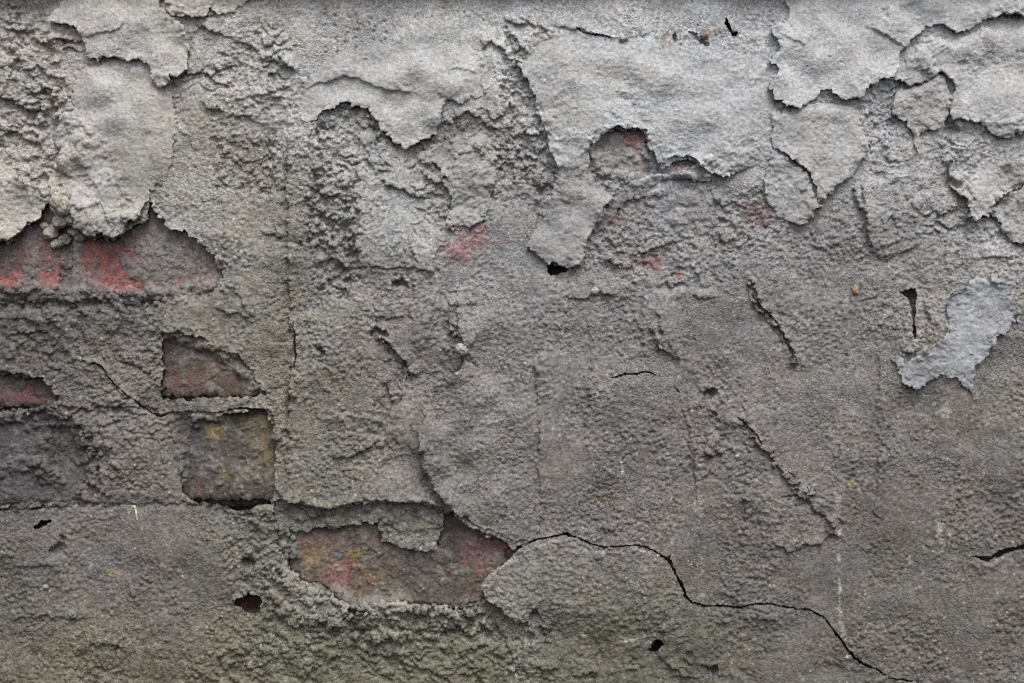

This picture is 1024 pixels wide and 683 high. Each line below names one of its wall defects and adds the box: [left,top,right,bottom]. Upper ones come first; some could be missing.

peeling [0,0,247,305]
peeling [297,36,498,230]
peeling [514,0,1024,268]
spalling [0,370,92,510]
spalling [160,332,518,614]
crack [504,532,917,682]
crack [610,371,825,509]
crack [970,544,1024,562]